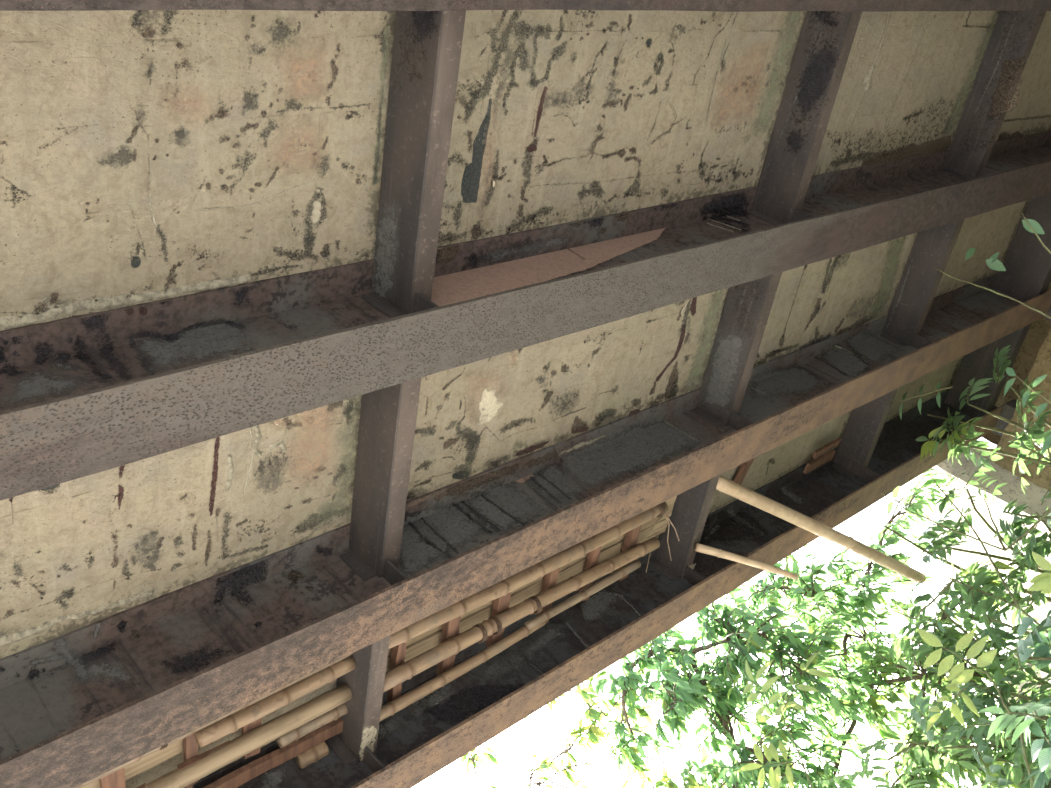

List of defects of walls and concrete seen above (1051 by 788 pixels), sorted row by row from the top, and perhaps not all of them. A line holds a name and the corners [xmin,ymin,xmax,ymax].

mould [131,10,177,80]
mould [456,10,675,121]
mould [100,125,139,166]
mould [205,83,313,195]
corrosion [532,86,549,137]
damp [438,139,566,243]
damp [578,178,668,208]
damp [131,243,141,268]
spalling [478,388,503,425]
corrosion [109,465,125,512]
corrosion [209,437,220,516]
damp [212,399,358,614]